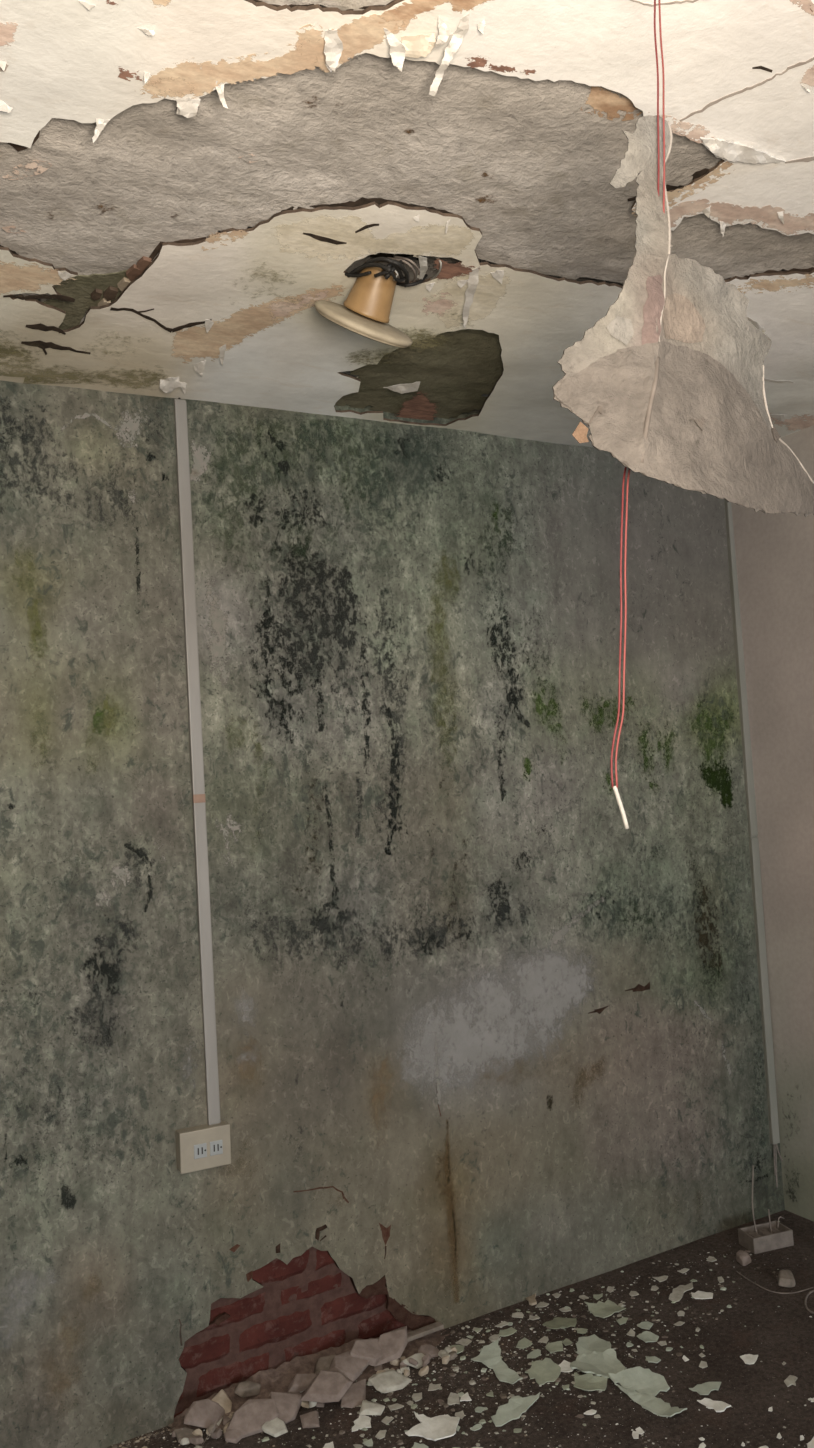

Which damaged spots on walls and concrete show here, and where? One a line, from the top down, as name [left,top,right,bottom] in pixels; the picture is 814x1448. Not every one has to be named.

peeling [790,0,814,16]
peeling [800,65,814,93]
spalling [0,0,644,420]
spalling [661,115,814,294]
peeling [762,365,814,483]